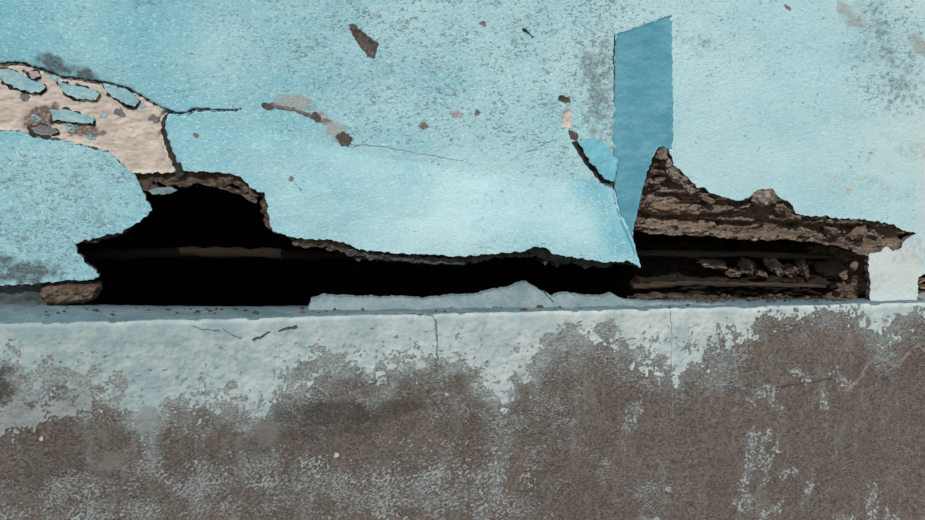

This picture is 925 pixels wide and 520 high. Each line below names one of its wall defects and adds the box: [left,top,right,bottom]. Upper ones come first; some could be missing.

peeling [349,24,379,58]
peeling [0,64,925,462]
peeling [1,421,540,520]
peeling [732,425,798,520]
peeling [862,481,901,520]